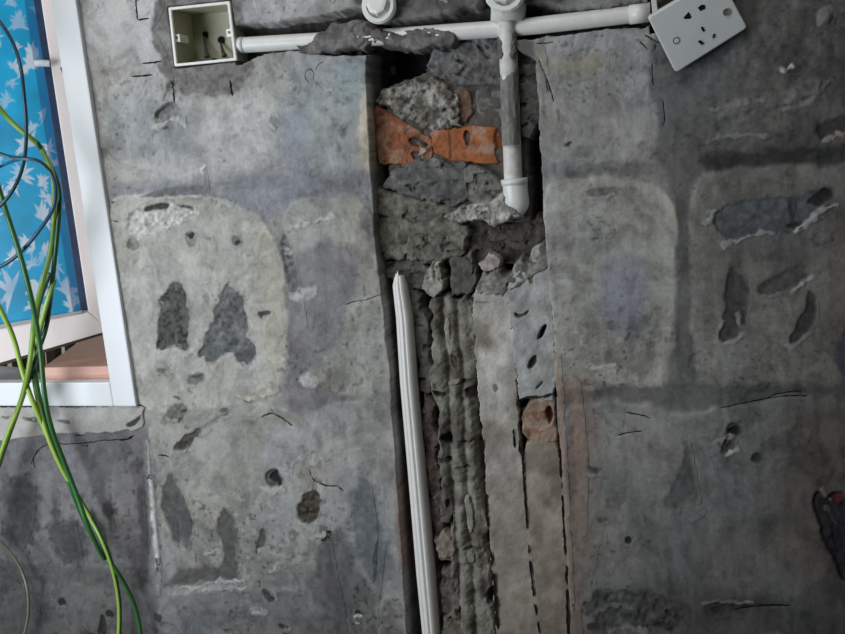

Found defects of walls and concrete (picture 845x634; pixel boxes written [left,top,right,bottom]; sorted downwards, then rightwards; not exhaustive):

flaking render [122,163,236,255]
flaking render [699,185,840,251]
flaking render [712,263,819,352]
flaking render [153,276,280,454]
crack [721,391,807,408]
flaking render [292,476,338,541]
flaking render [810,485,845,588]
crack [734,603,788,611]